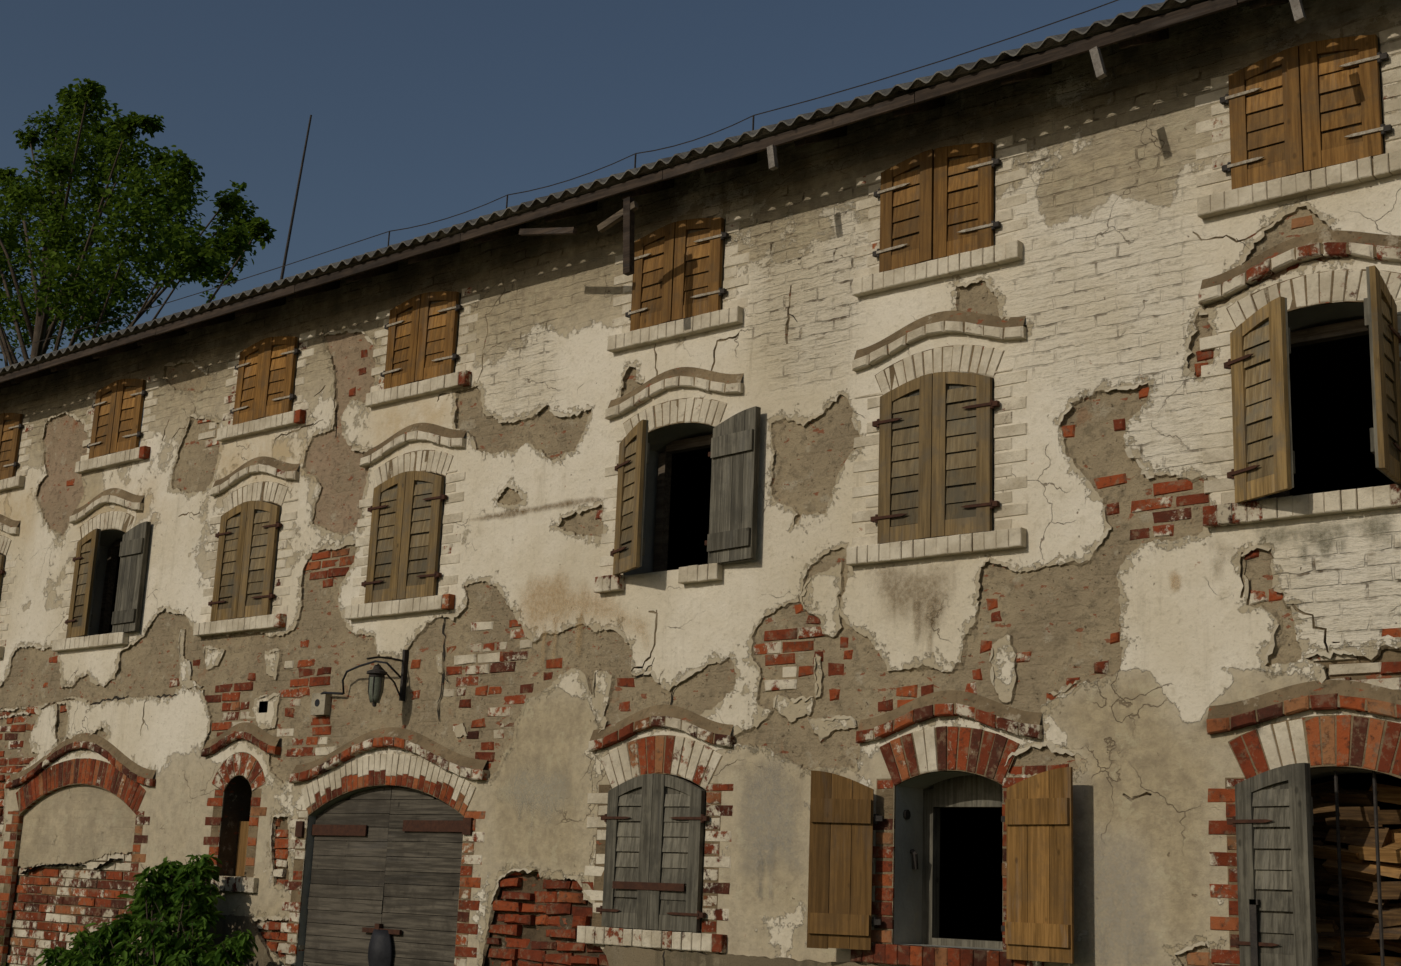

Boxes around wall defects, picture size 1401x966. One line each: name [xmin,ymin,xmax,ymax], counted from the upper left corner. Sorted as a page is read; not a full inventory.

spalling [1240,203,1332,265]
spalling [0,328,737,837]
spalling [736,382,1209,776]
spalling [1241,545,1401,690]
spalling [484,868,616,966]